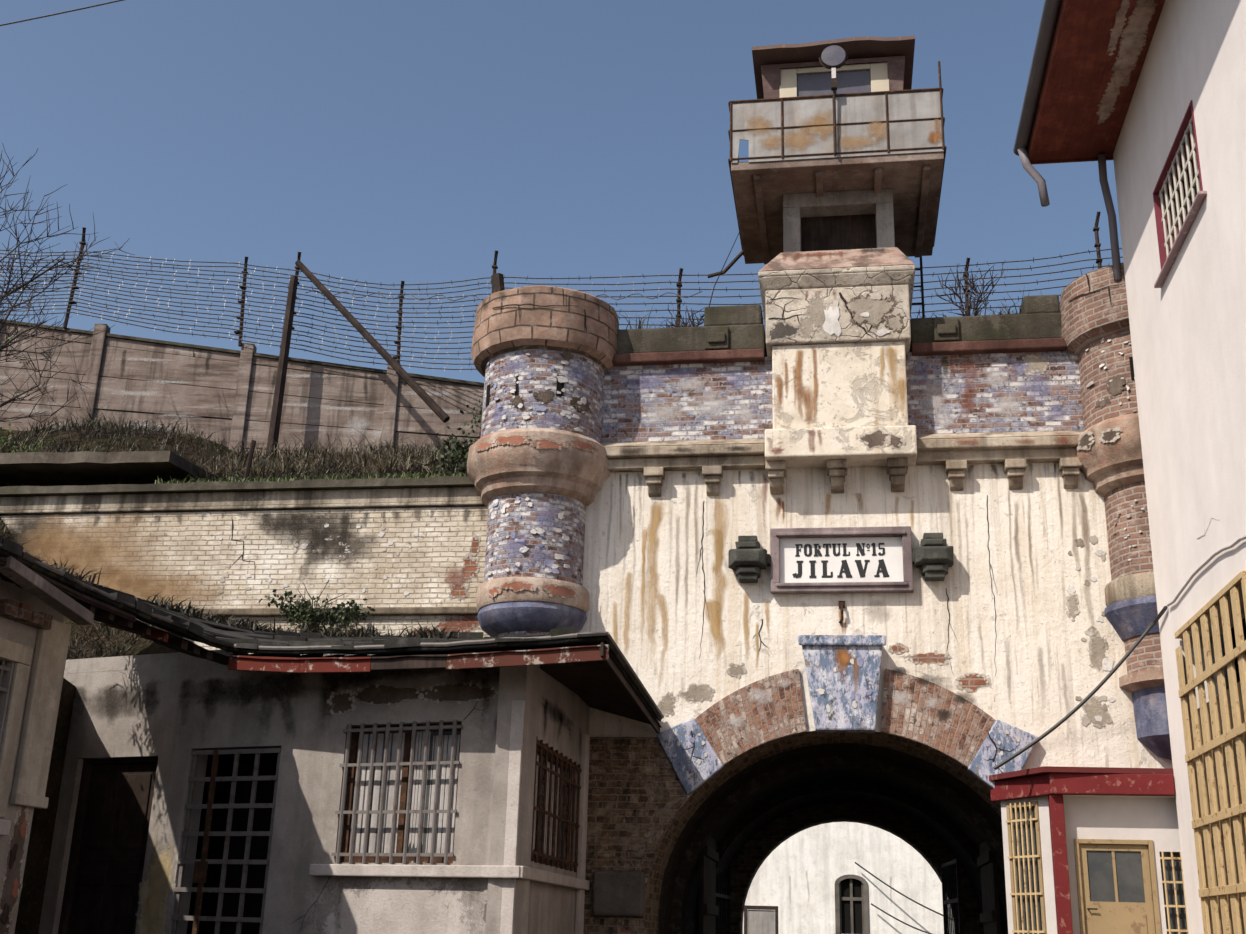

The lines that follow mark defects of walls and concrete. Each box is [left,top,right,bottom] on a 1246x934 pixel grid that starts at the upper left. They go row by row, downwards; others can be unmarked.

peeling [1096,0,1158,124]
rust [751,114,885,147]
crack [768,297,804,323]
flaking render [766,288,905,342]
crack [839,292,894,338]
flaking render [856,429,906,451]
water stain [262,512,365,559]
water stain [9,516,210,604]
rust [706,501,725,645]
flaking render [1081,611,1114,672]
water stain [323,669,411,715]
water stain [460,667,500,706]